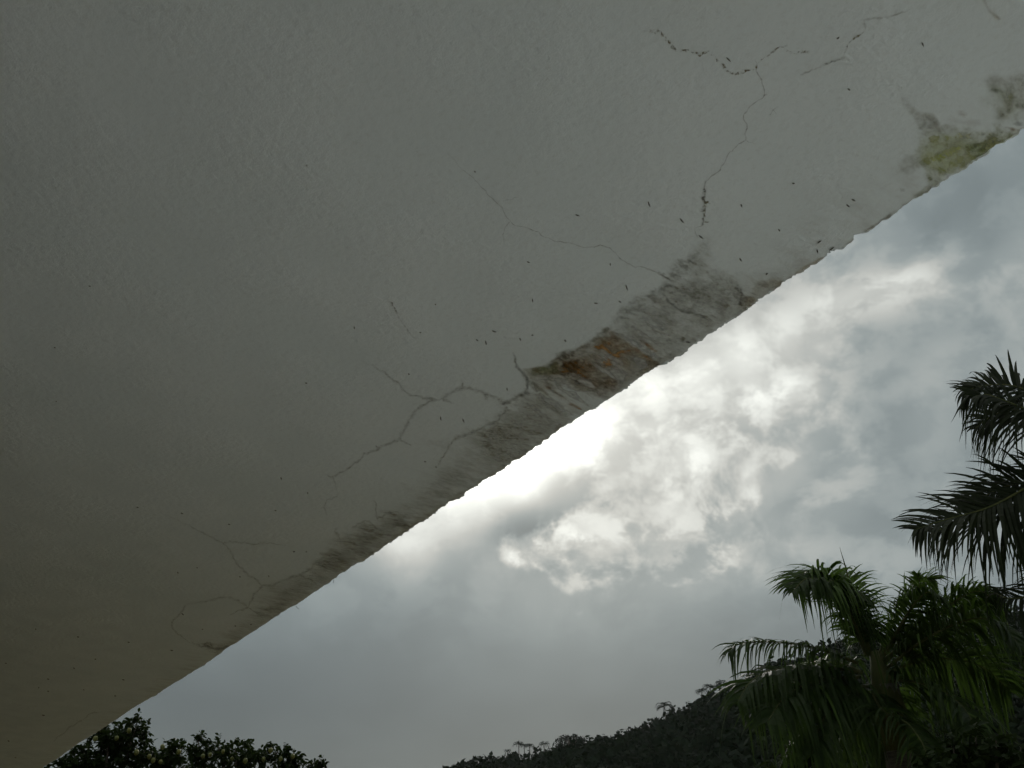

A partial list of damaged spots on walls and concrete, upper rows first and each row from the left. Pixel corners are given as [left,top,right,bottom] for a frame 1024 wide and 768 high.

corrosion [553,325,667,409]